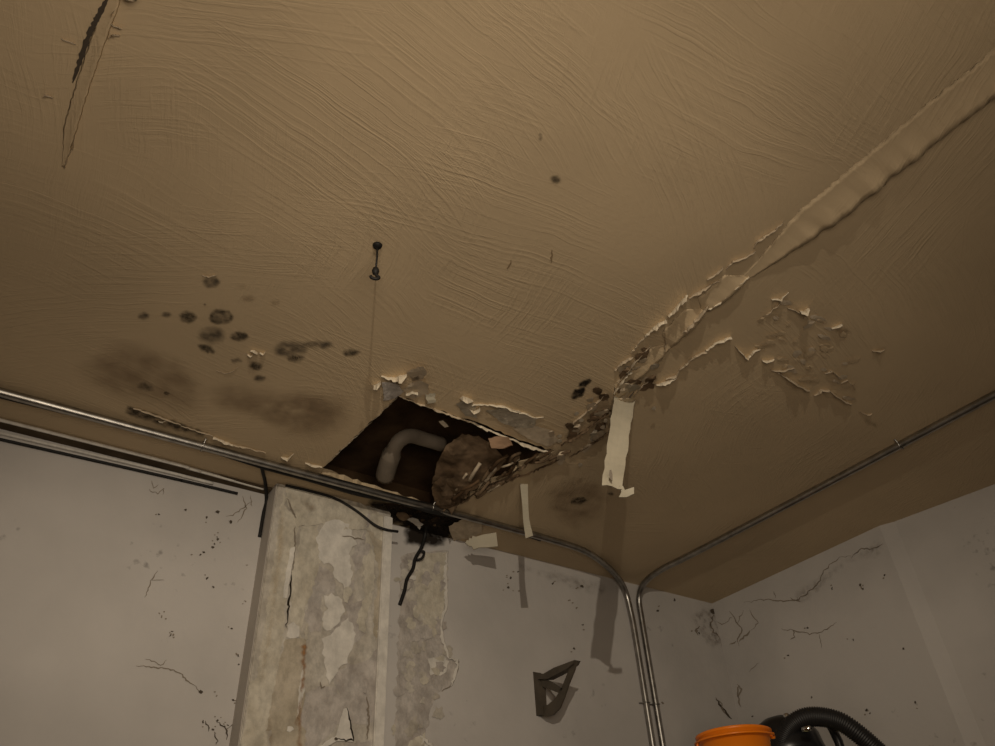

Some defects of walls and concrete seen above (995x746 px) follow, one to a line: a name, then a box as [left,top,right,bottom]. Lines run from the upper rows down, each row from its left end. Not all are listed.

crack [72,0,108,83]
leakage [200,310,247,353]
spalling [305,221,872,468]
spalling [128,407,266,454]
crack [216,496,252,524]
flaking render [241,487,482,746]
crack [695,544,882,647]
crack [138,659,203,694]
crack [716,663,758,719]
crack [205,721,232,744]